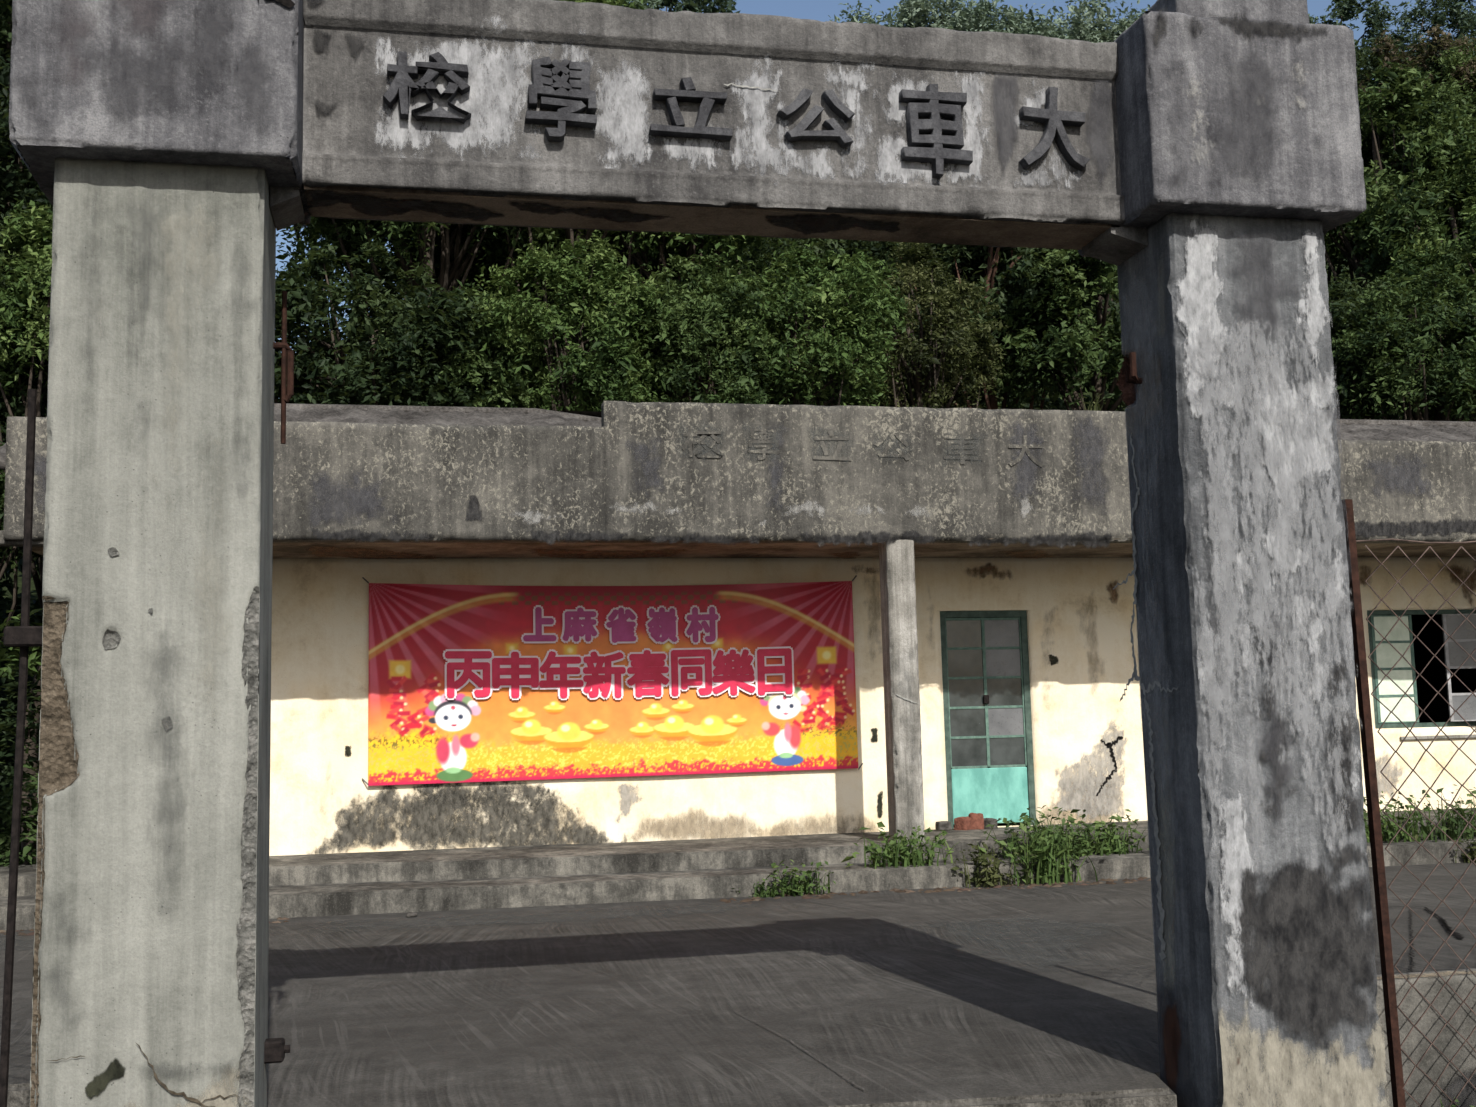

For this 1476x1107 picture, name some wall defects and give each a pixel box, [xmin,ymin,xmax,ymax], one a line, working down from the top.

crack [258,0,295,8]
peeling [375,16,989,189]
peeling [1014,80,1046,127]
peeling [1014,152,1081,189]
spalling [102,629,121,650]
crack [1096,433,1178,960]
damp [1256,622,1297,818]
peeling [1176,219,1388,1107]
damp [1376,756,1402,797]
damp [315,781,873,854]
damp [1239,659,1377,1050]
crack [135,1042,239,1107]